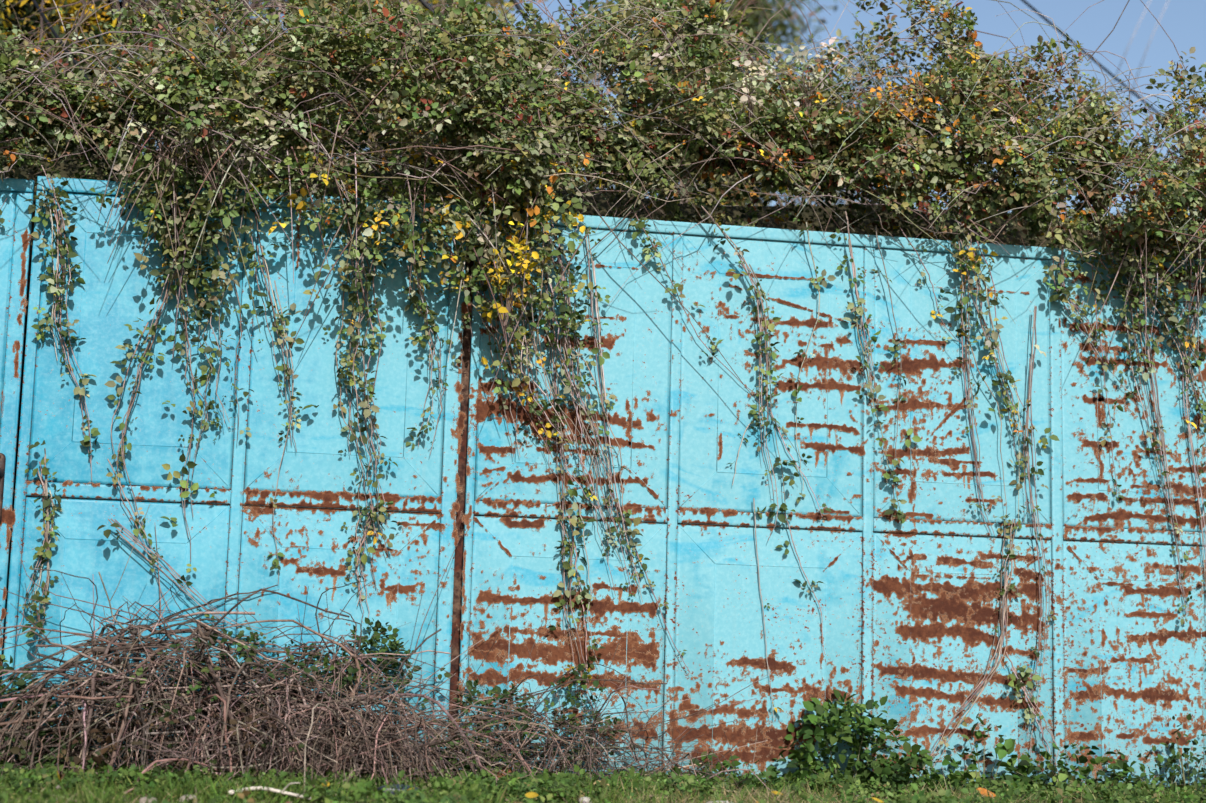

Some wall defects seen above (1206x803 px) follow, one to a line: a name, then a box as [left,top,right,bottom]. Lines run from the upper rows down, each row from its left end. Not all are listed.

corrosion [0,229,32,429]
corrosion [0,497,16,550]
corrosion [27,263,1206,779]